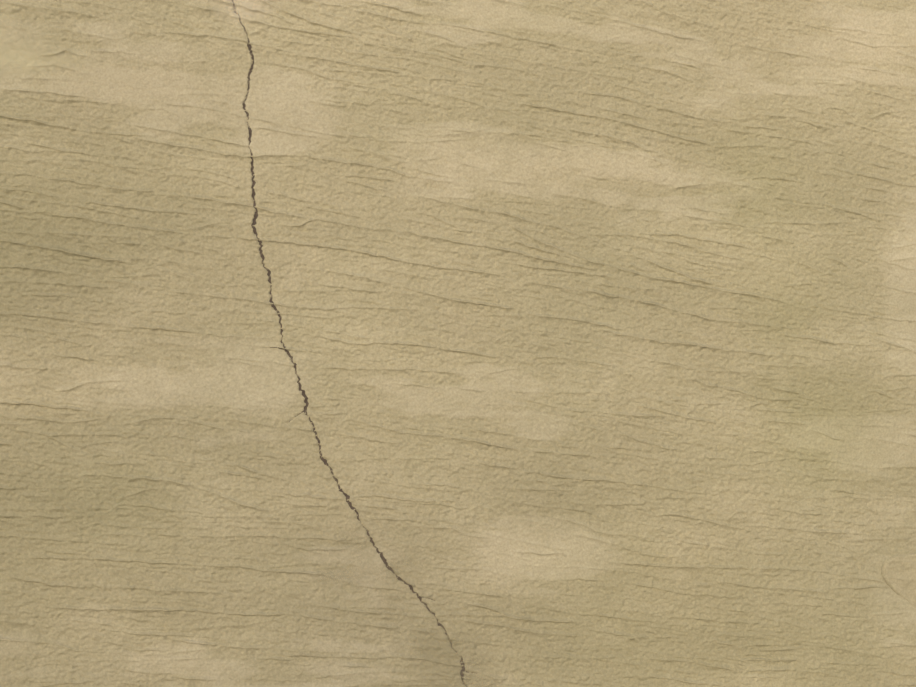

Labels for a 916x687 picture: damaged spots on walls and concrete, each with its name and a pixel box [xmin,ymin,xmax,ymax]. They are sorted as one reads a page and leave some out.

crack [231,0,477,687]